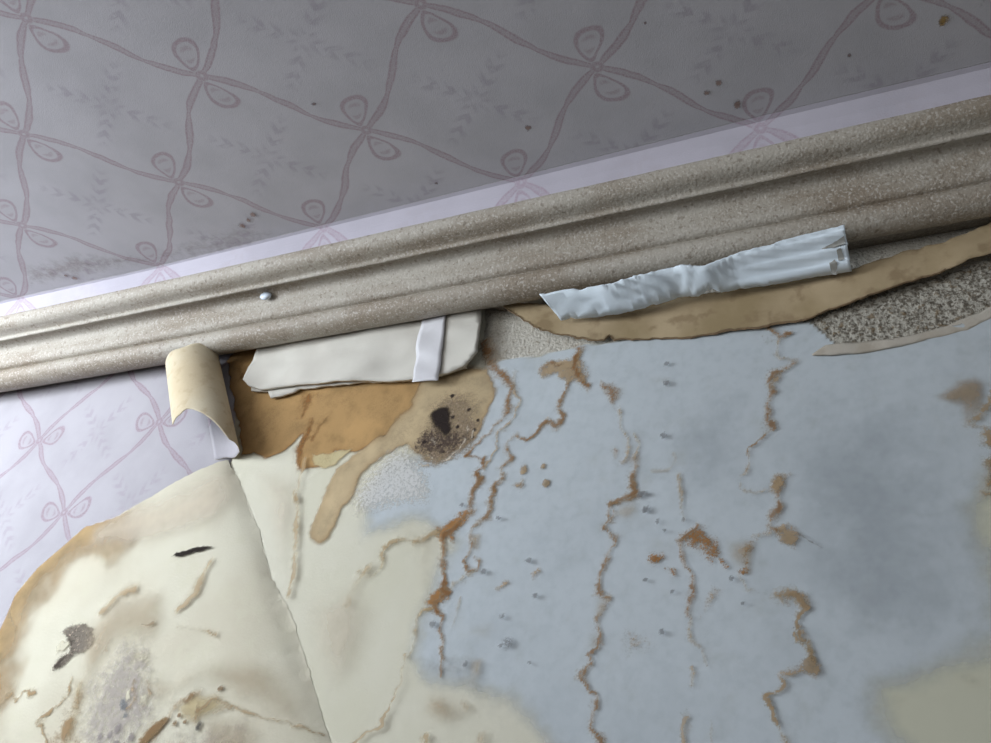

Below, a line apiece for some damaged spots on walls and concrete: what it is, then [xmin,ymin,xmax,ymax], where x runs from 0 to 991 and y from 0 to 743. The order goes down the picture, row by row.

peeling [812,259,991,356]
leakage [0,486,217,706]
leakage [36,653,225,743]
leakage [227,318,991,743]